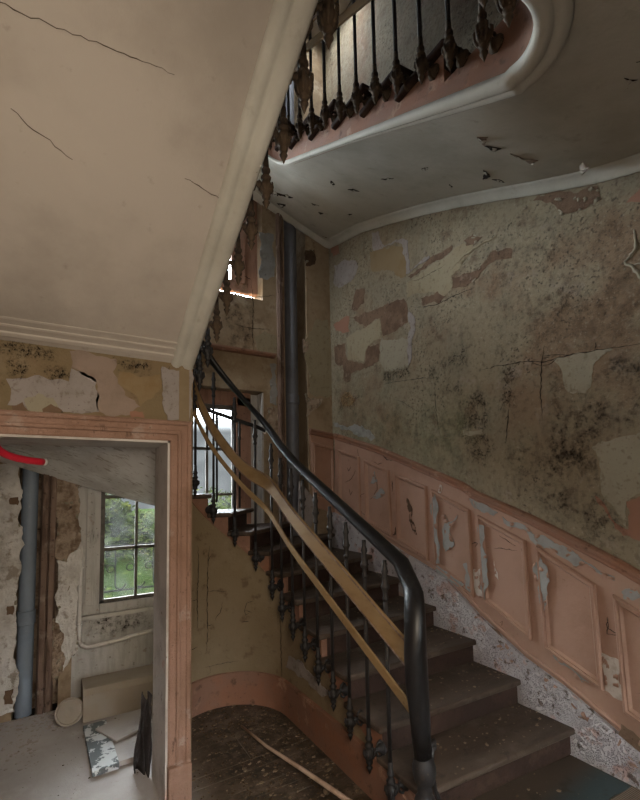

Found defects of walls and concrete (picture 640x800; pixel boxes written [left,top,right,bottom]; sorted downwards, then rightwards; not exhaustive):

crack [0,2,174,75]
peeling [302,231,512,416]
peeling [6,350,179,420]
crack [486,343,640,408]
peeling [554,348,613,394]
peeling [592,433,640,527]
peeling [52,479,82,687]
peeling [430,485,458,564]
peeling [463,524,498,600]
peeling [532,558,550,609]
peeling [468,497,615,581]
peeling [617,724,640,770]